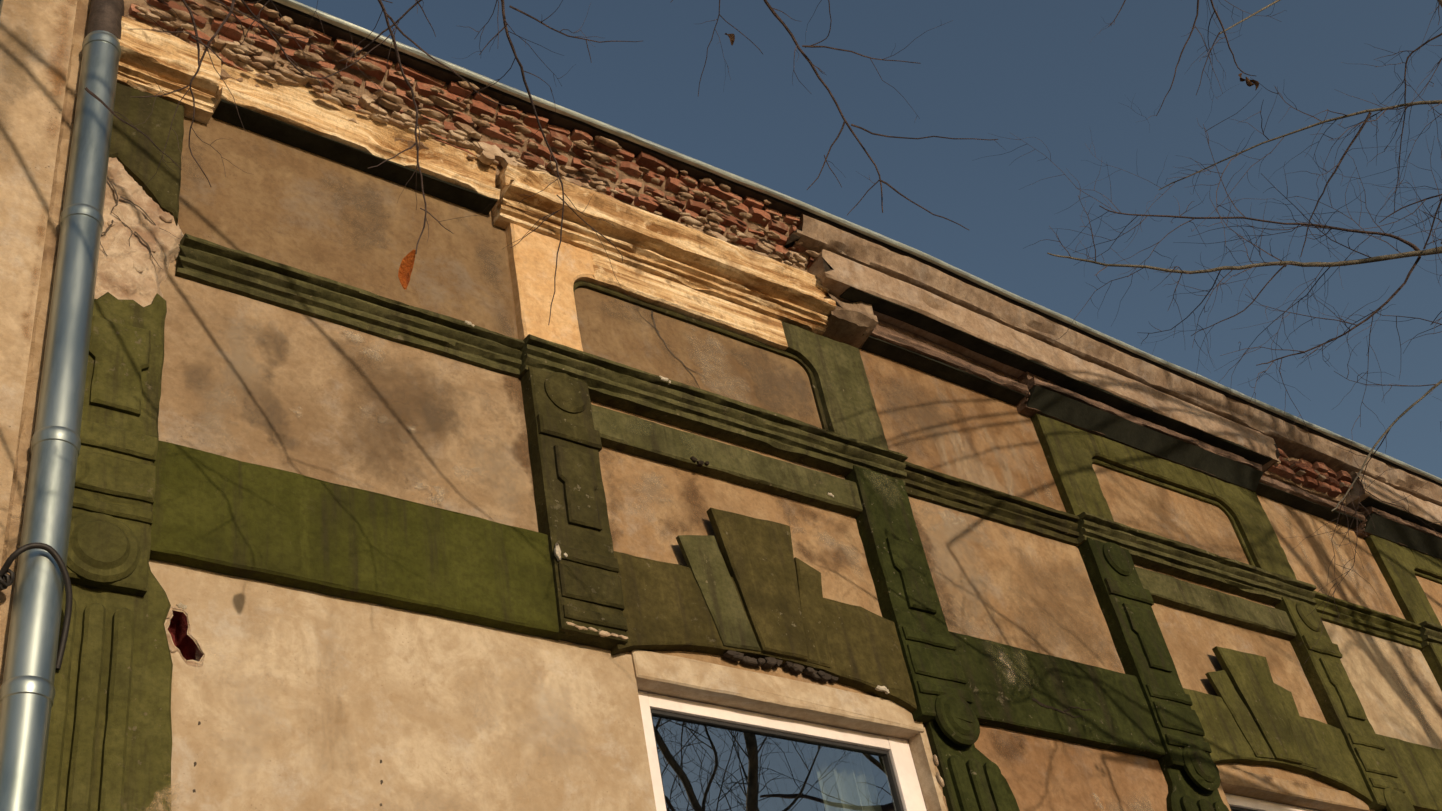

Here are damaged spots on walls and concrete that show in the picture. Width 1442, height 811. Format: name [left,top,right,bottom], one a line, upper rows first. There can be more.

spalling [128,0,820,268]
spalling [94,157,184,307]
leakage [505,378,523,407]
spalling [1263,448,1353,505]
spalling [164,602,205,667]